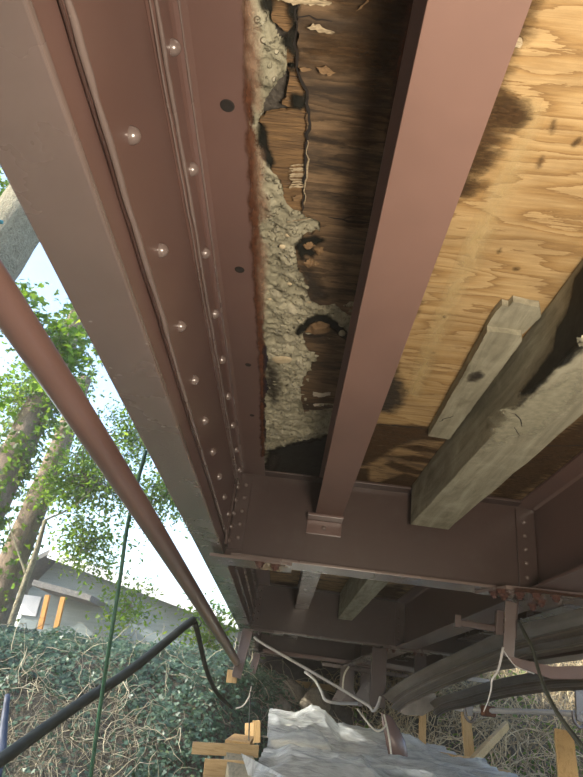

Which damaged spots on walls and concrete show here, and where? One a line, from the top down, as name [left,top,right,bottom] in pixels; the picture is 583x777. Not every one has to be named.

corrosion [243,0,266,457]
spalling [244,0,354,463]
crack [293,4,332,213]
water stain [309,0,407,227]
water stain [460,88,526,196]
water stain [519,1,537,39]
water stain [262,345,328,476]